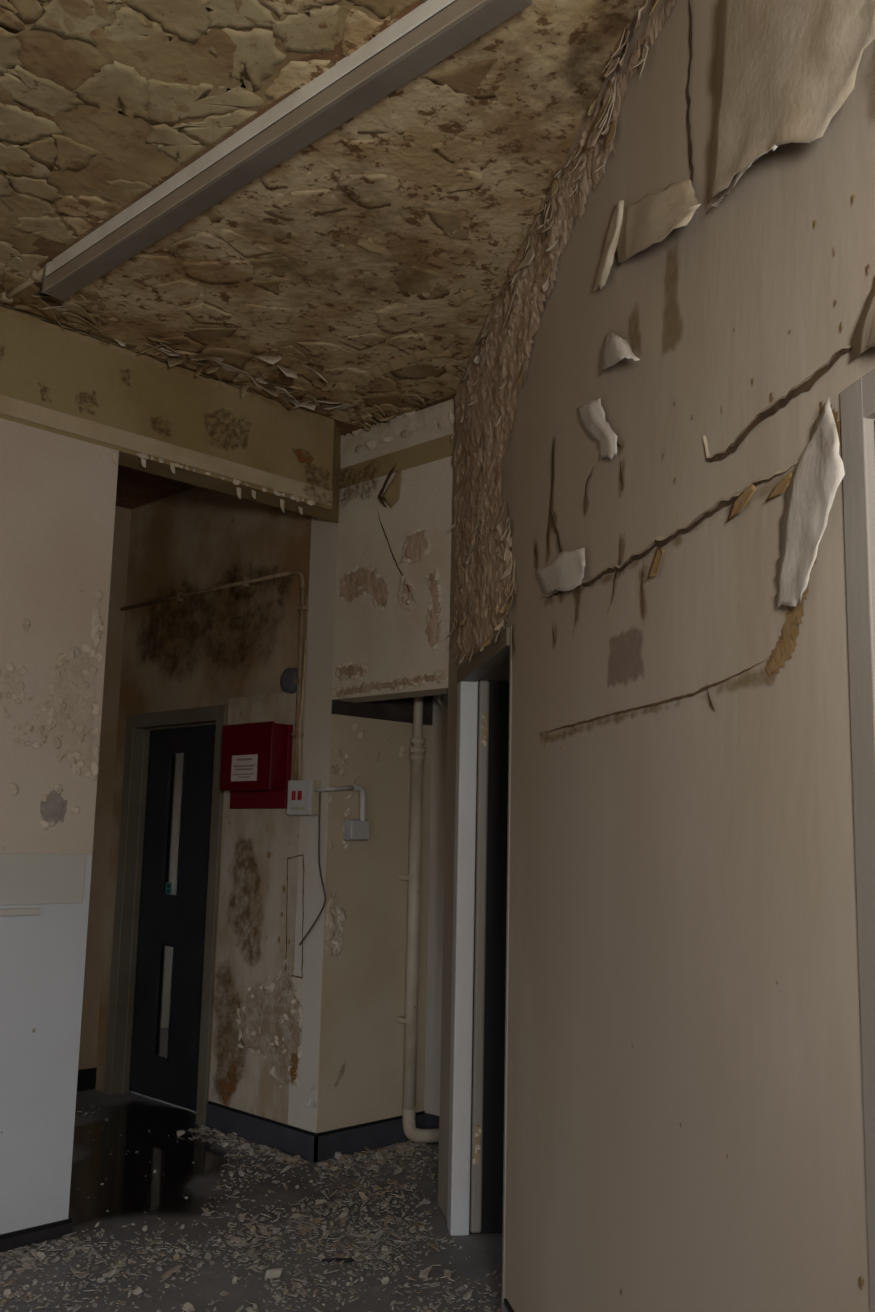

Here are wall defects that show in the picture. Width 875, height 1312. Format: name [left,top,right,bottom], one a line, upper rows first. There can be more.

peeling [0,0,676,698]
crack [702,344,852,462]
leakage [608,629,642,684]
leakage [230,841,260,964]
leakage [215,968,244,1096]